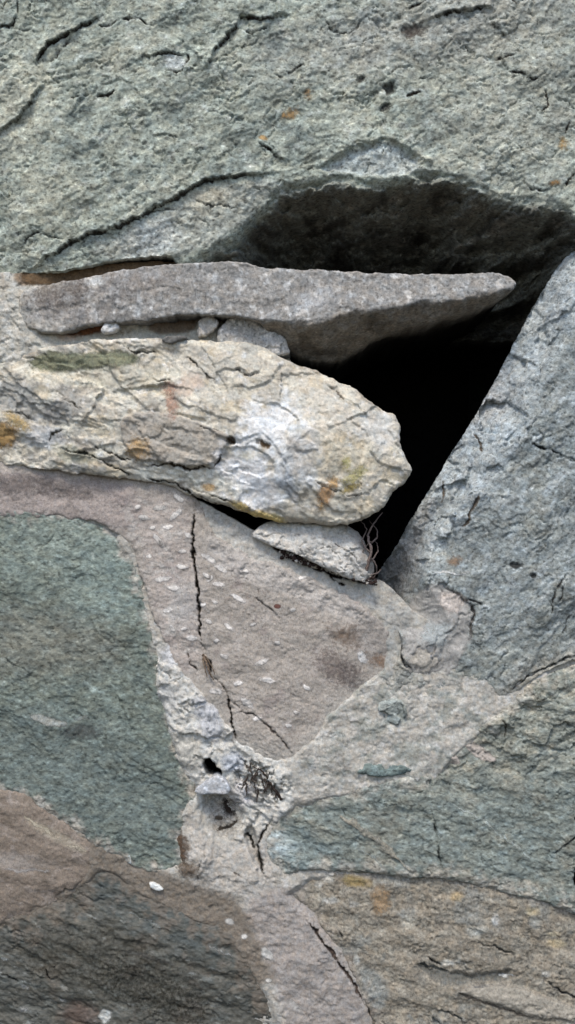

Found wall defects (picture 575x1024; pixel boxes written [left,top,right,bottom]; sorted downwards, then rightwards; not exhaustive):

crack [49,430,287,746]